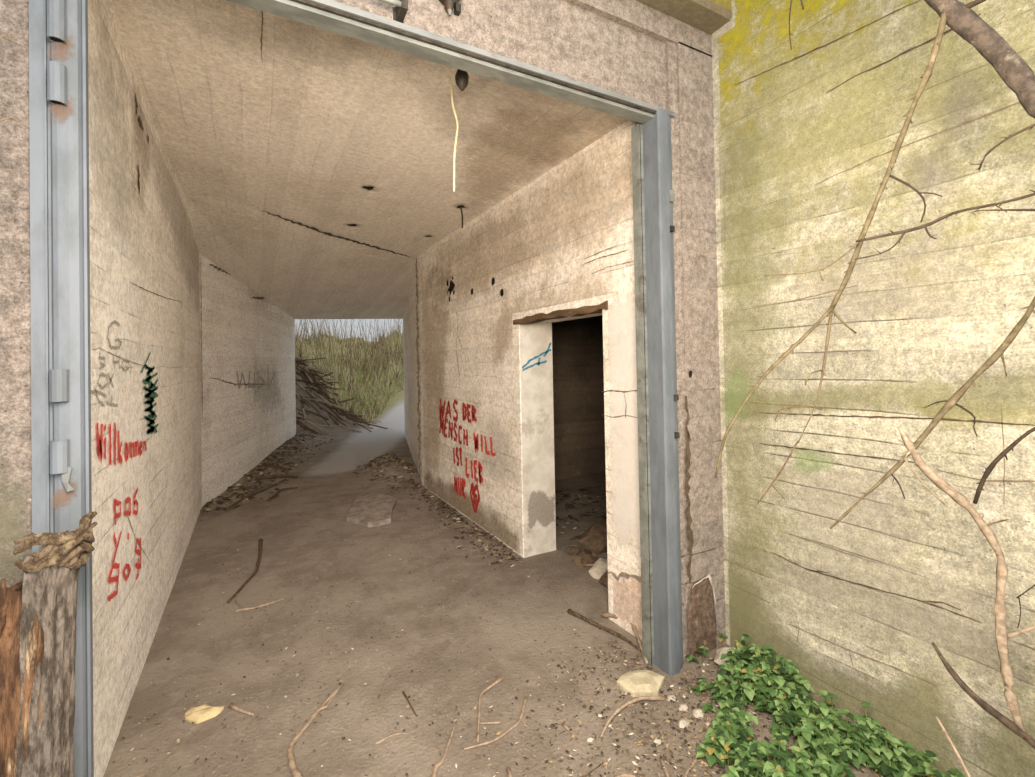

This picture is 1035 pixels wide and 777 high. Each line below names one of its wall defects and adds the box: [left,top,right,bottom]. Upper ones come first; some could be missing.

spalling [528,491,555,529]
crack [685,396,694,583]
spalling [688,575,717,661]